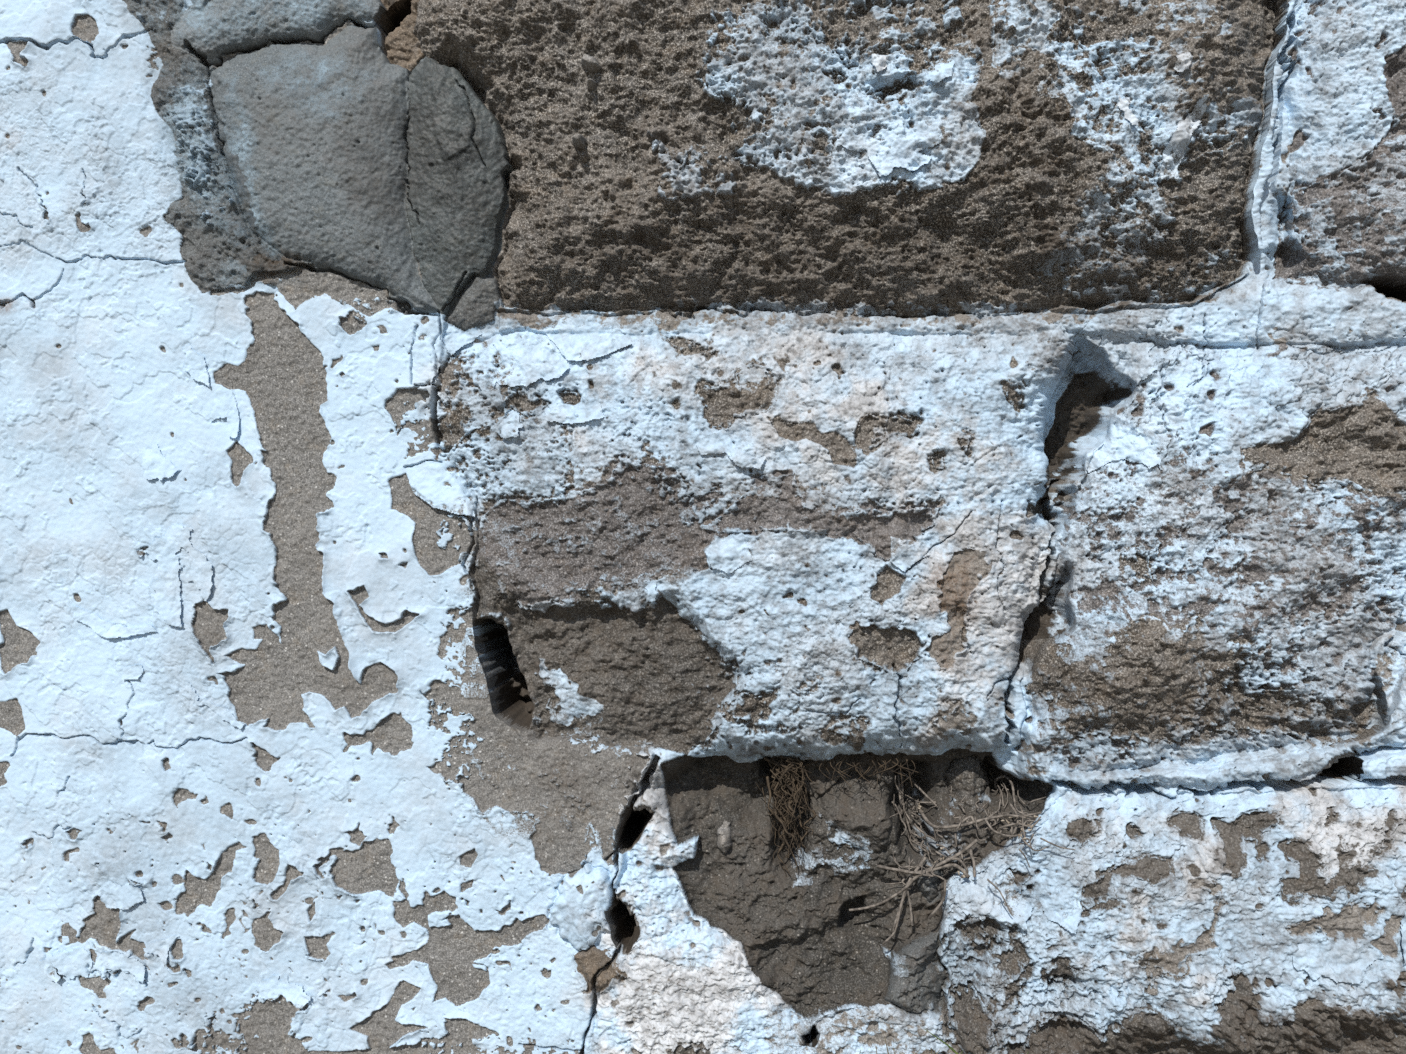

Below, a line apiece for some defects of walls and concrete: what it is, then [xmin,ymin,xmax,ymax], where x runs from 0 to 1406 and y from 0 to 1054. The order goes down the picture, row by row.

crack [3,30,154,59]
crack [0,168,185,309]
crack [404,56,426,223]
crack [456,80,486,166]
peeling [704,0,1263,199]
peeling [69,291,419,757]
crack [462,497,478,589]
peeling [379,317,942,877]
spalling [1019,613,1390,746]
peeling [38,818,550,1054]
crack [519,752,665,1054]
peeling [942,807,1406,1054]